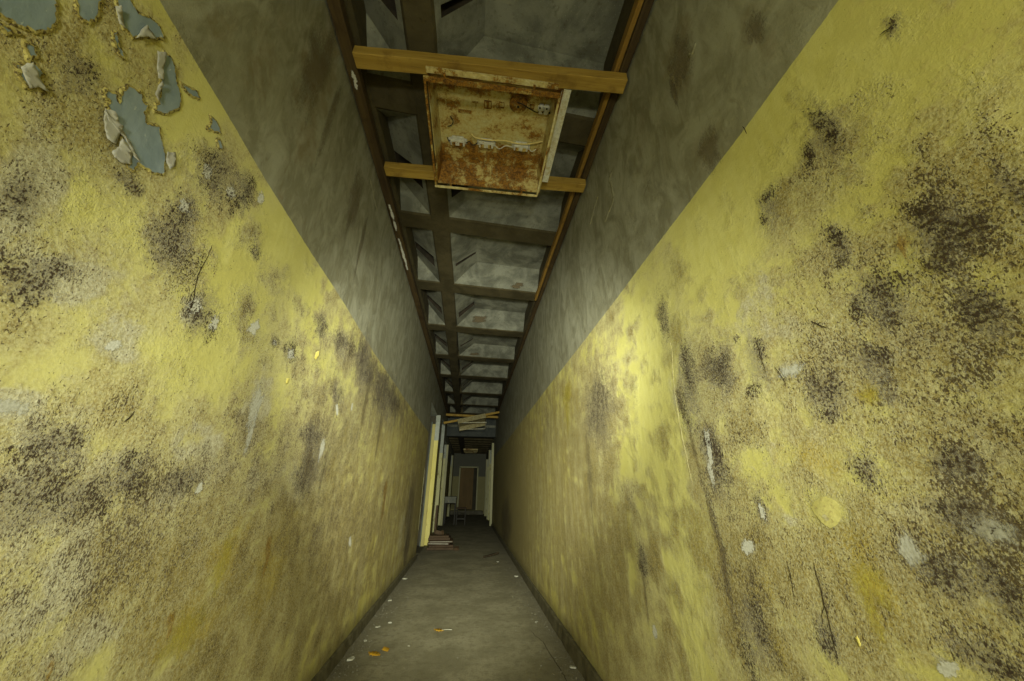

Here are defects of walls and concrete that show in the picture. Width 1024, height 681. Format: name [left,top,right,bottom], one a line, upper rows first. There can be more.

peeling [0,0,59,95]
peeling [73,0,200,177]
damp [802,106,848,170]
damp [138,139,264,347]
damp [825,184,1017,390]
damp [657,300,734,488]
damp [0,423,204,534]
damp [927,444,988,482]
damp [924,494,1017,545]